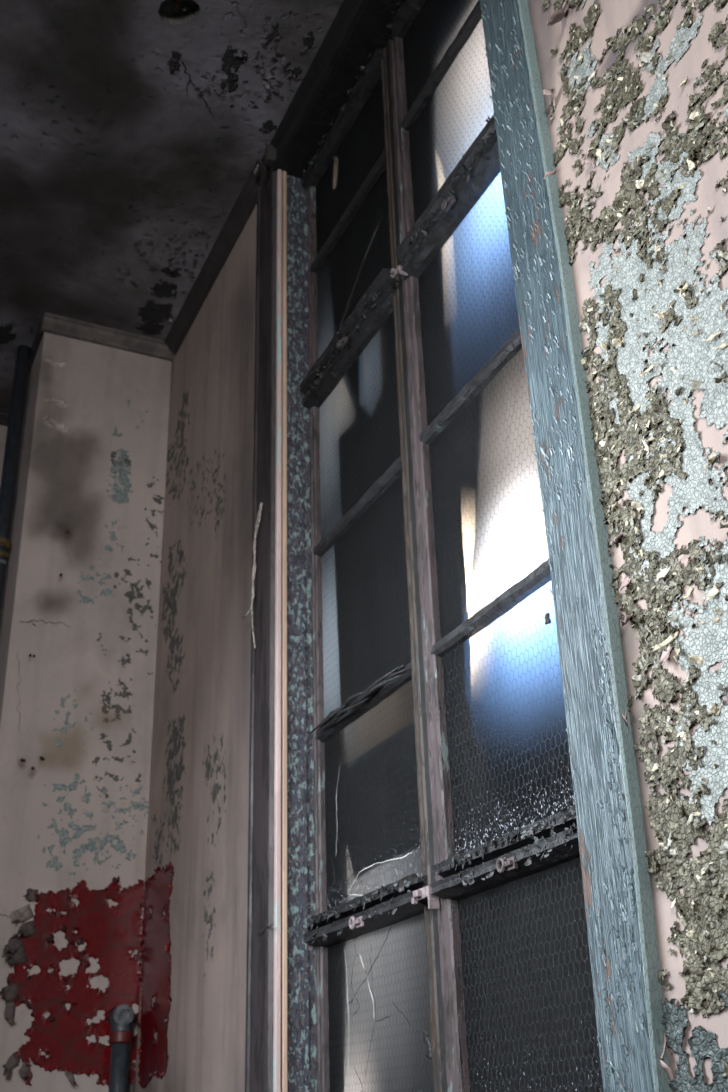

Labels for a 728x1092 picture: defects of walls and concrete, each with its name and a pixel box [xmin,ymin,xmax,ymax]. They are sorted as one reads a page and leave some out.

damp [49,10,145,119]
spalling [37,391,226,890]
peeling [541,0,728,1092]
peeling [46,911,90,969]